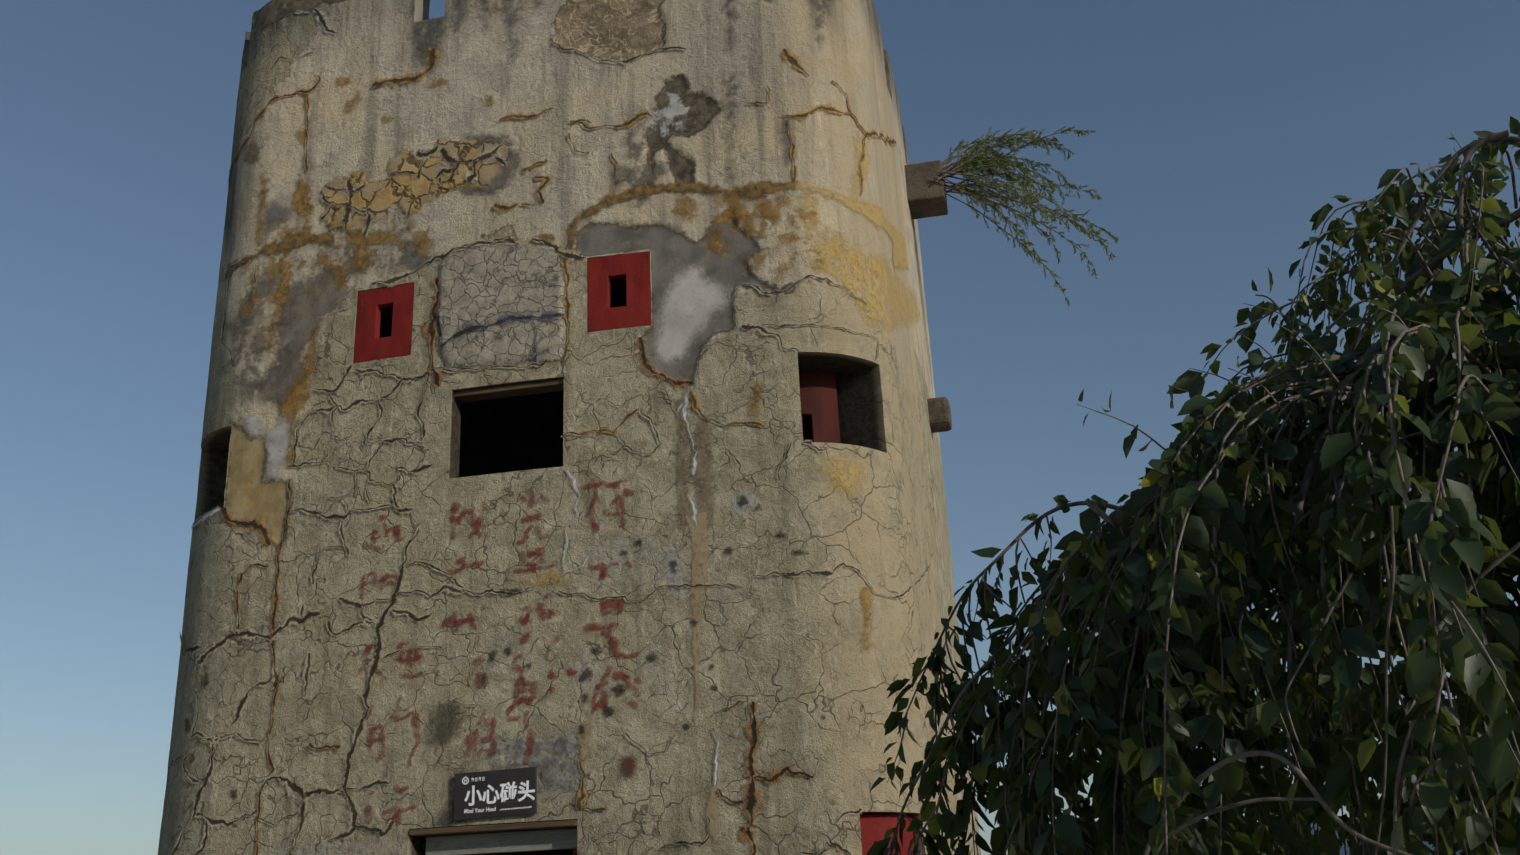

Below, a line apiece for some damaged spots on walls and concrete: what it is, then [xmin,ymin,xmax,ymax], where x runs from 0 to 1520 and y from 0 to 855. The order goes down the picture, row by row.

spalling [550,0,666,61]
peeling [643,73,721,183]
water stain [264,205,291,232]
peeling [320,135,521,236]
peeling [575,207,795,386]
water stain [225,276,300,547]
crack [158,8,929,855]